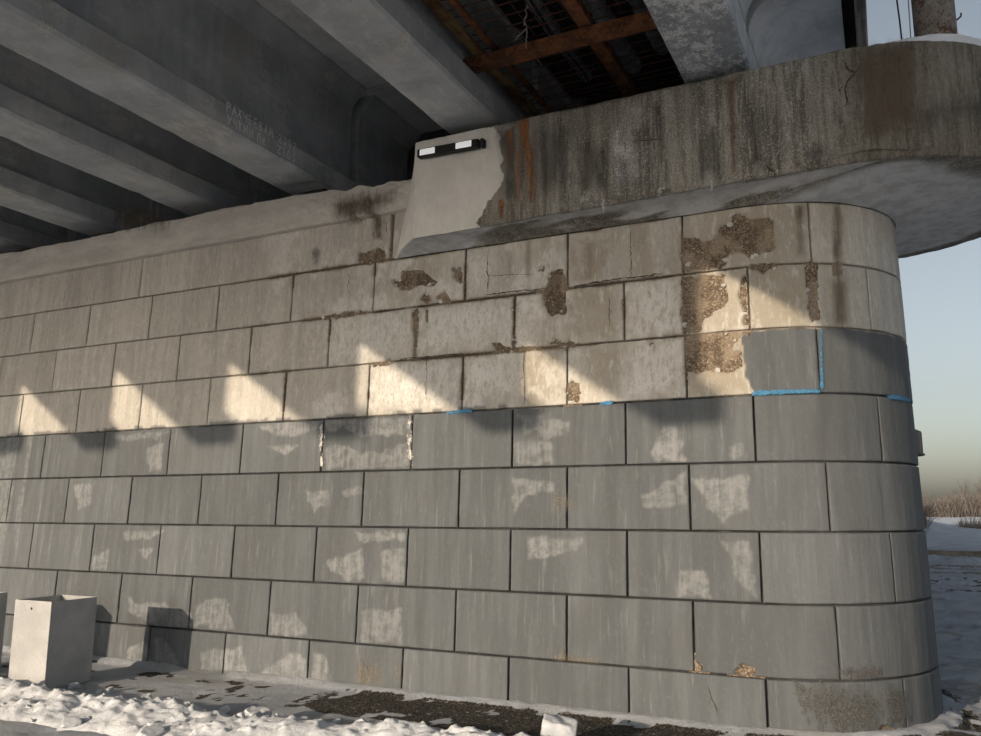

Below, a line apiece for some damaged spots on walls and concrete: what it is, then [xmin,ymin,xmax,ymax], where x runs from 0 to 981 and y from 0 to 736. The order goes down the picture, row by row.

crack [838,61,861,107]
leakage [334,194,388,238]
spalling [452,261,467,287]
spalling [536,264,574,316]
spalling [675,207,783,380]
spalling [367,270,459,370]